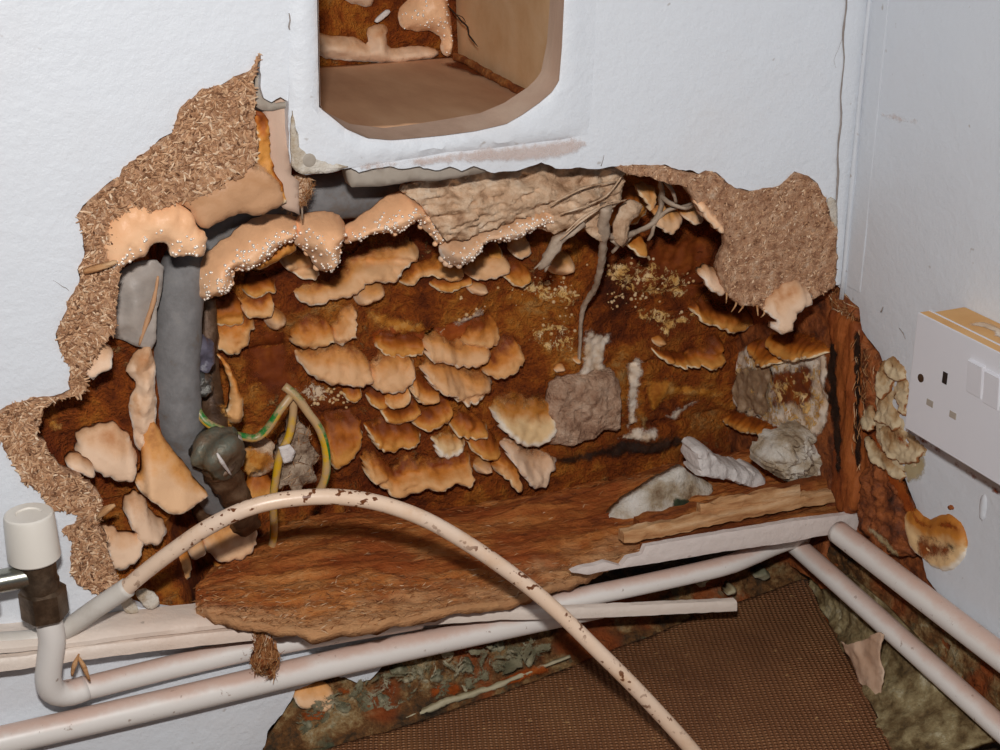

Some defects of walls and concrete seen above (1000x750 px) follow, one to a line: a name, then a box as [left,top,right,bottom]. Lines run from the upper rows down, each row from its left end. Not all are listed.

flaking render [545,367,622,446]
flaking render [732,367,771,416]